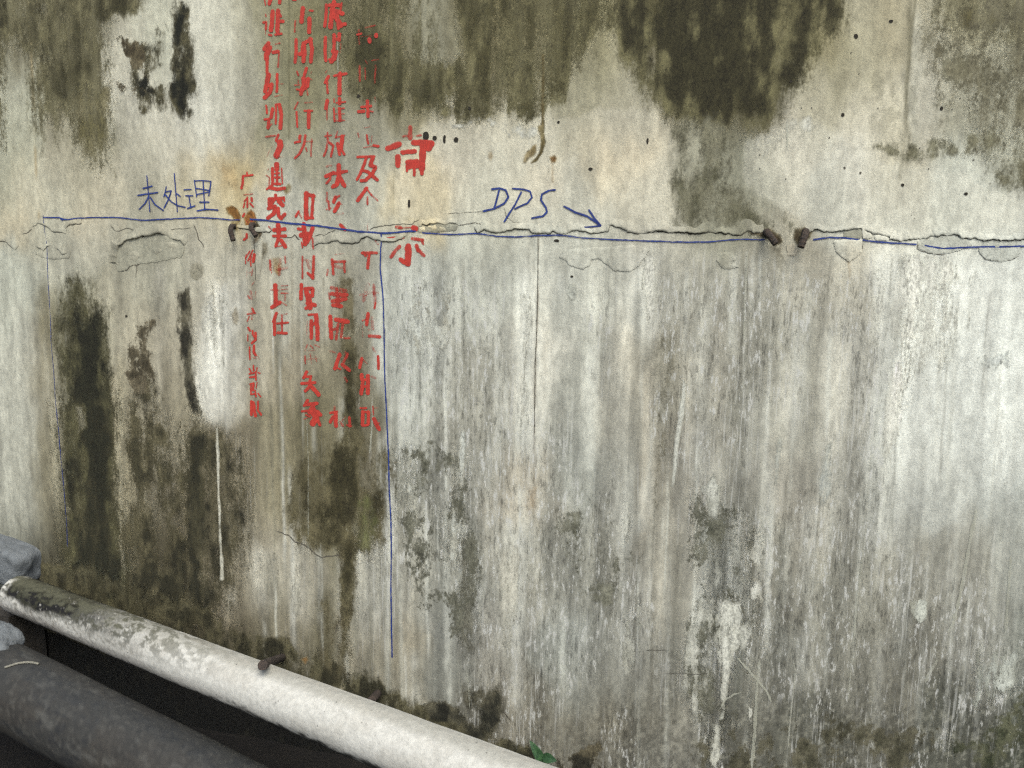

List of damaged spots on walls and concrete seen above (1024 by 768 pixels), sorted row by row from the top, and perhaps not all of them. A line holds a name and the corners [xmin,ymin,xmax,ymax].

water stain [0,0,196,169]
corrosion [523,55,556,163]
water stain [335,0,848,235]
crack [0,215,82,250]
spalling [108,222,187,272]
corrosion [226,206,281,275]
crack [237,220,419,280]
corrosion [750,227,812,252]
spalling [843,229,889,242]
crack [805,220,1024,249]
spalling [917,236,1021,262]
water stain [40,264,606,768]